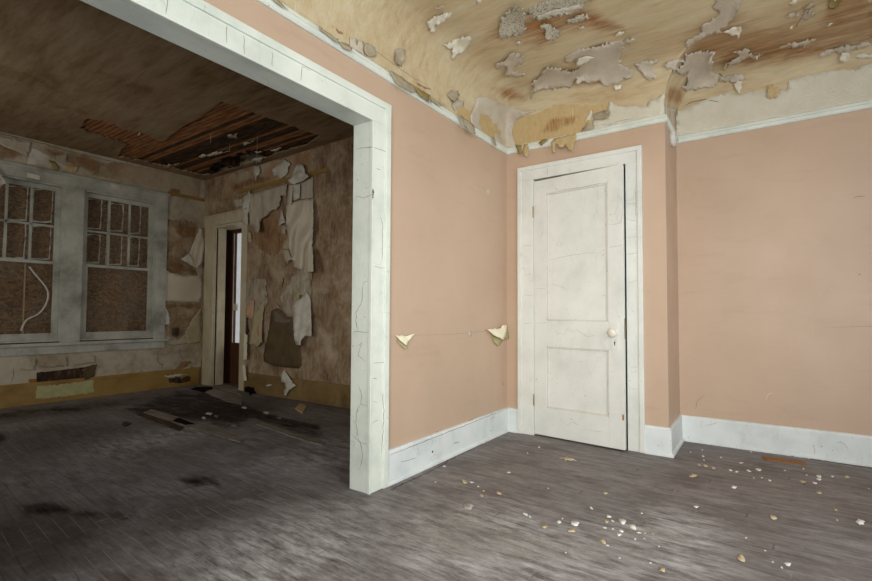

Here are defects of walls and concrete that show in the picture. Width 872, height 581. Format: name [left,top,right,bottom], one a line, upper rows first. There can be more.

peeling [319,26,377,57]
peeling [388,0,872,157]
flaking render [166,219,202,276]
flaking render [165,301,202,340]
spalling [28,364,97,383]